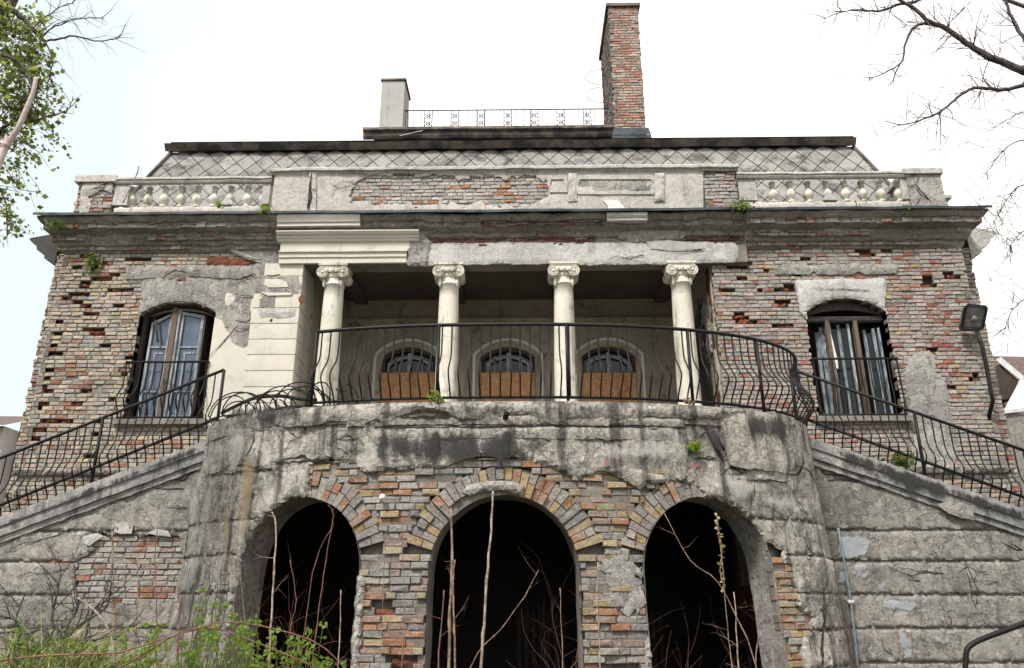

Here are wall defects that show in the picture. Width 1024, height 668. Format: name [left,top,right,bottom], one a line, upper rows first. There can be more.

crack [307,171,358,209]
flaking render [349,175,551,209]
flaking render [603,200,624,208]
spalling [67,263,134,316]
flaking render [167,271,186,281]
flaking render [207,245,303,332]
water stain [403,404,516,415]
water stain [376,430,548,463]
water stain [604,443,674,466]
water stain [701,422,722,451]
flaking render [36,521,183,605]